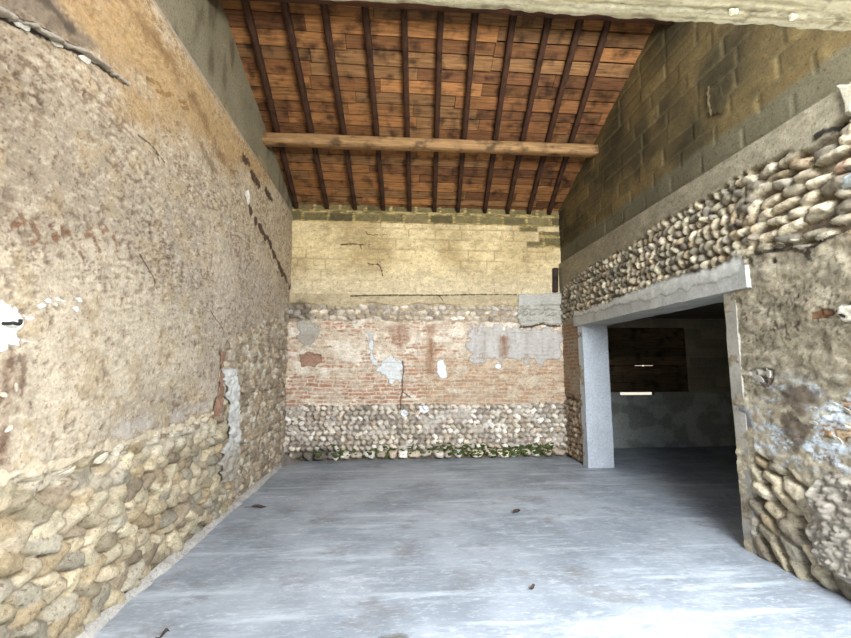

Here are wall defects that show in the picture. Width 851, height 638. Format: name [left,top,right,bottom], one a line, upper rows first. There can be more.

crack [245,189,291,289]
peeling [296,320,322,367]
peeling [465,323,563,365]
flaking render [812,309,834,319]
peeling [0,350,226,488]
leakage [740,380,851,473]